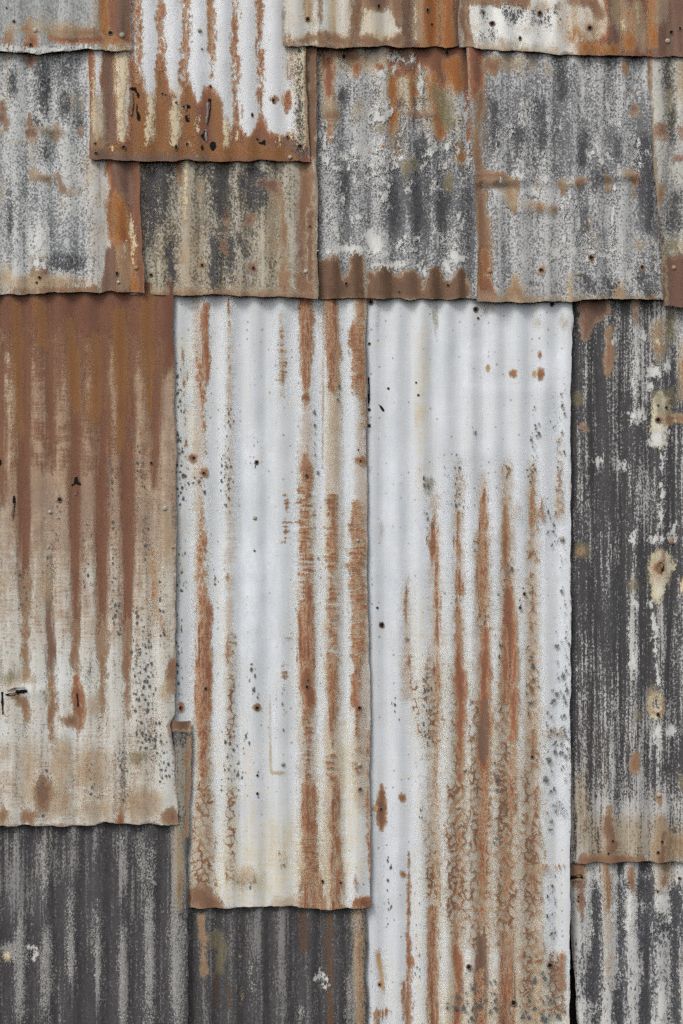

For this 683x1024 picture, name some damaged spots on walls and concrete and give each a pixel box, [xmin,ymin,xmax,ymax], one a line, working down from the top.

rust [535,176,589,215]
rust [567,0,683,377]
rust [0,0,543,743]
rust [532,350,545,381]
peeling [637,406,683,475]
peeling [653,551,666,575]
rust [160,497,238,1005]
rust [281,432,669,1024]
rust [0,774,54,826]